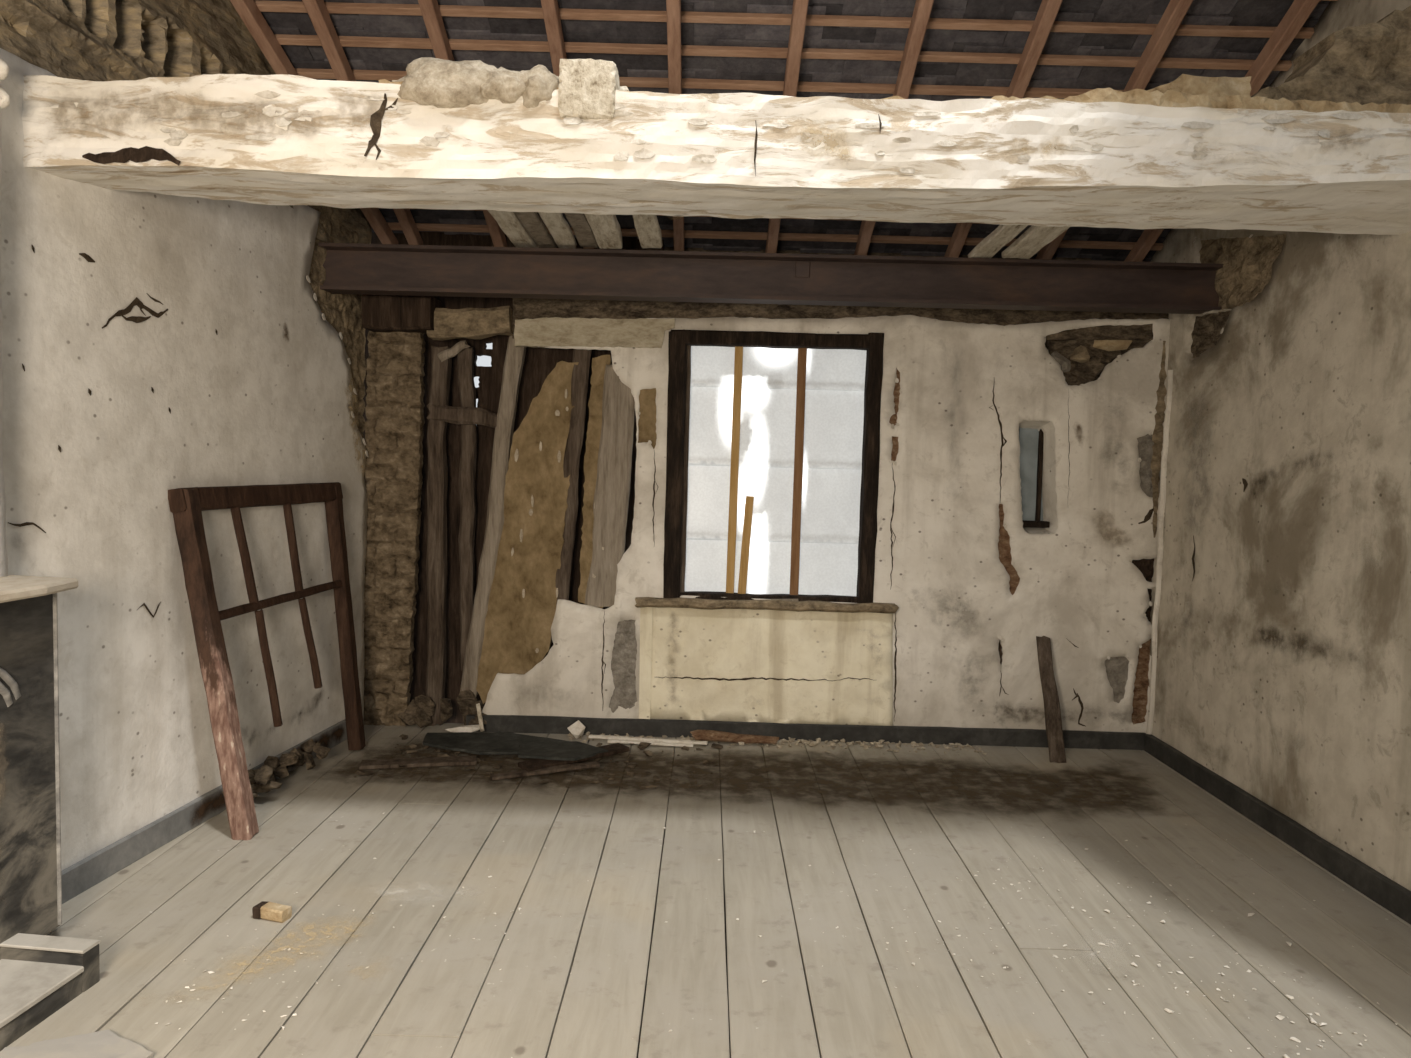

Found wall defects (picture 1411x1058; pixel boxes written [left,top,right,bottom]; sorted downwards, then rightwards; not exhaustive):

crack [102,294,168,329]
spalling [1045,340,1151,387]
crack [989,387,1007,500]
spalling [1137,430,1161,498]
crack [659,468,897,721]
spalling [998,503,1020,595]
spalling [1129,558,1154,622]
spalling [609,620,639,713]
spalling [1105,639,1151,729]